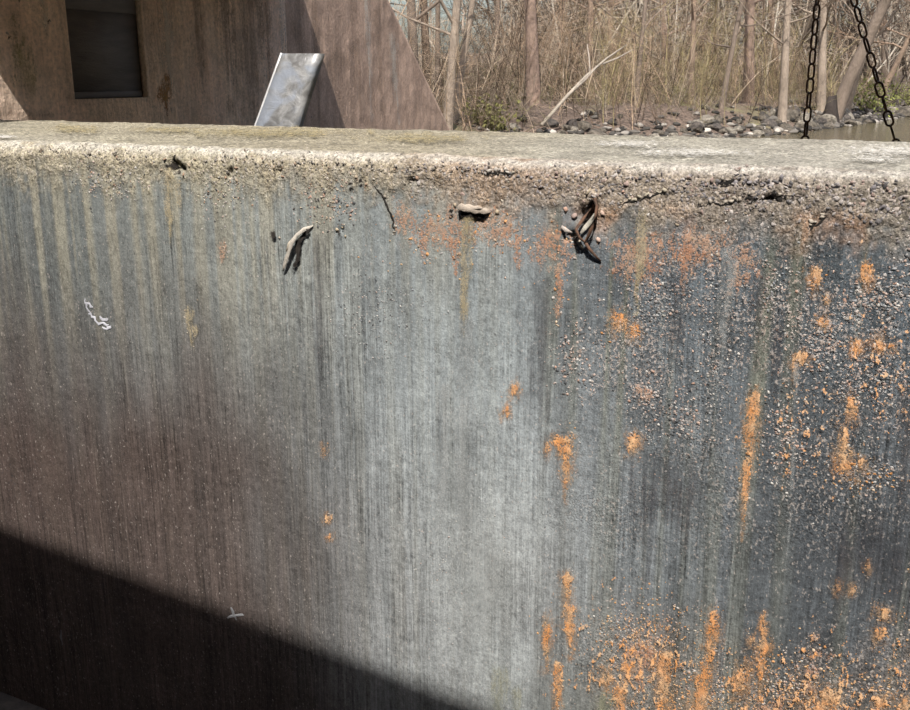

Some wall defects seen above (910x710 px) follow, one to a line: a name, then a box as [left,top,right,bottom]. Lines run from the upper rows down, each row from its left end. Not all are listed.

crack [374,186,397,235]
rust [389,191,585,327]
rust [602,207,768,307]
rust [807,256,842,332]
rust [855,262,881,289]
rust [542,423,581,490]
rust [729,314,910,526]